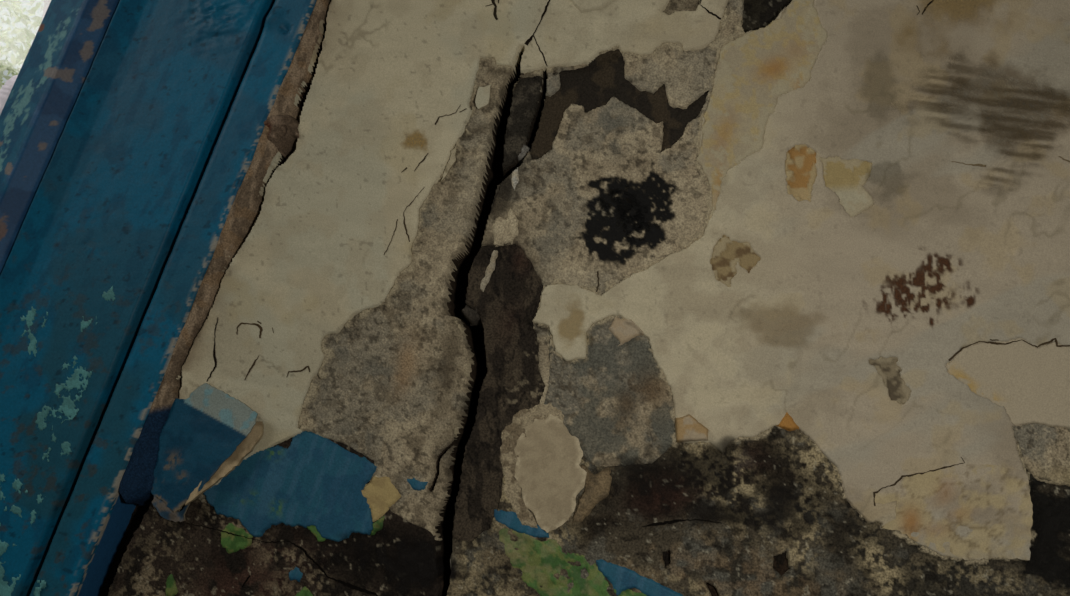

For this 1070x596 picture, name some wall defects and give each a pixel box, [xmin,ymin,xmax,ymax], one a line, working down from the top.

crack [297,23,327,111]
crack [384,153,428,255]
mould [579,162,676,267]
crack [180,318,274,382]
spalling [108,57,515,596]
crack [429,0,550,596]
spalling [404,0,1070,596]
rust [877,254,960,325]
peeling [35,356,93,462]
mould [676,440,735,492]
mould [689,472,814,536]
leakage [1019,478,1070,589]